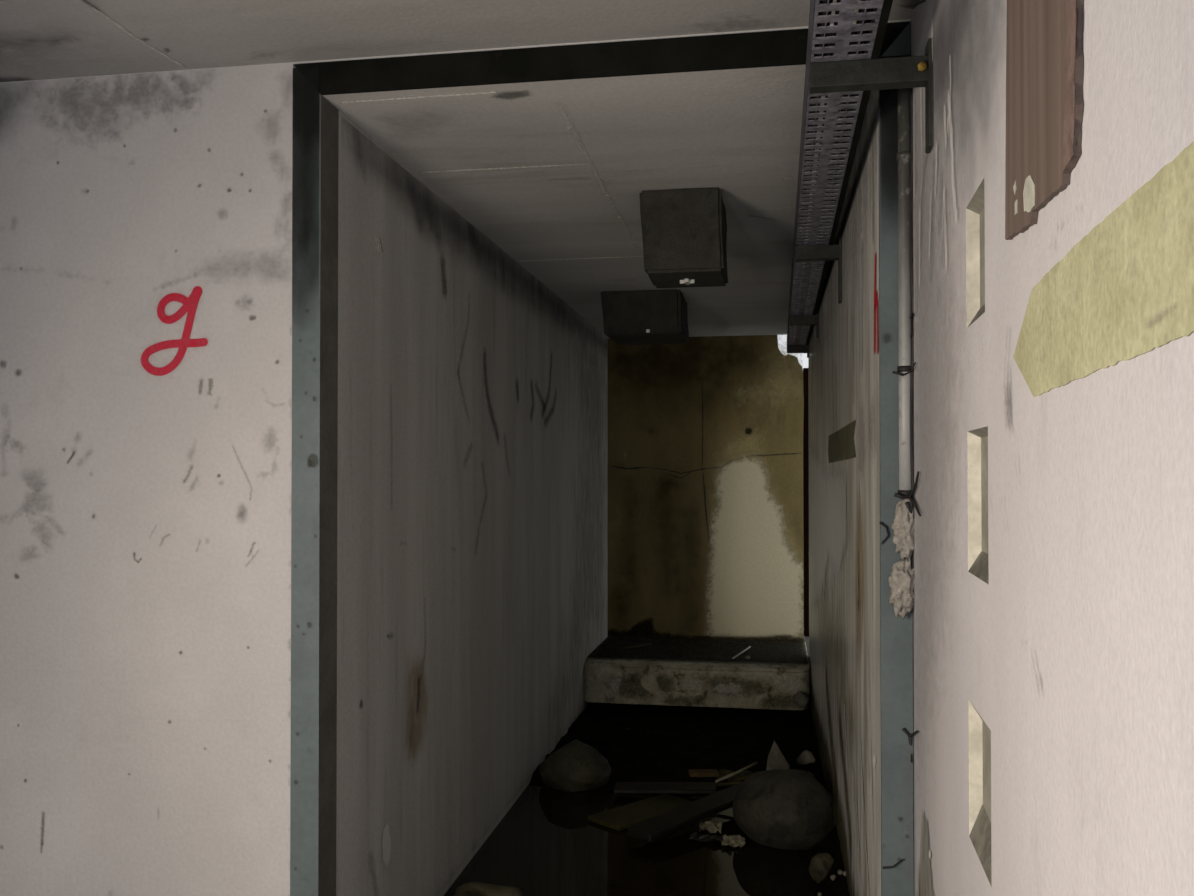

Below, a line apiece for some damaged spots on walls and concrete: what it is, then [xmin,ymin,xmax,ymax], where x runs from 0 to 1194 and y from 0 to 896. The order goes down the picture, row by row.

crack [612,387,798,542]
peeling [917,811,933,896]